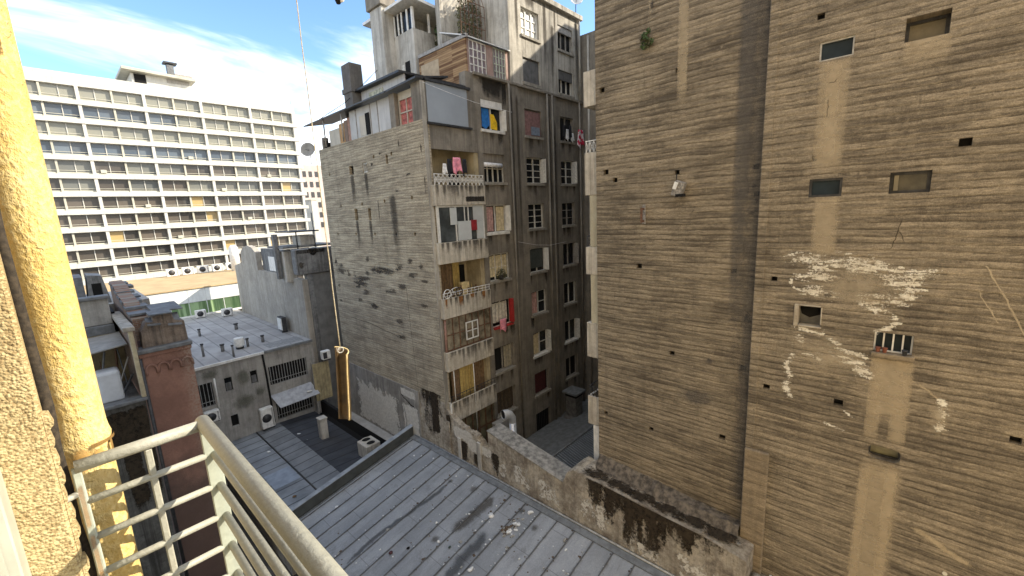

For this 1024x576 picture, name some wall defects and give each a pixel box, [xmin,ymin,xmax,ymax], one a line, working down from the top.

leakage [356,197,397,237]
efflorescence [783,249,949,335]
crack [979,266,1024,335]
efflorescence [781,326,876,398]
leakage [421,369,513,433]
efflorescence [919,384,949,432]
leakage [586,479,723,556]